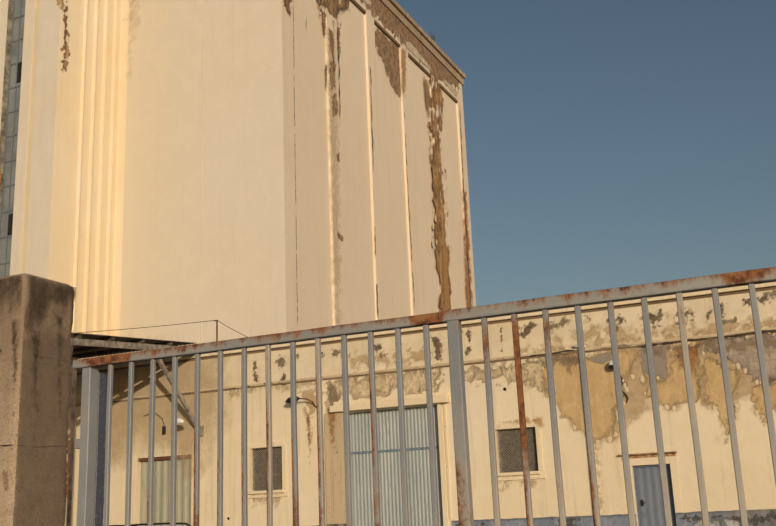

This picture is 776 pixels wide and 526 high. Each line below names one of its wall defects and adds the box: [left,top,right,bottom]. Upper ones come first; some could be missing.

spalling [57,0,70,72]
peeling [317,0,350,117]
peeling [375,29,406,97]
spalling [424,74,452,311]
damp [0,275,76,327]
damp [11,322,73,526]
damp [103,361,216,459]
peeling [326,362,445,413]
peeling [464,333,776,444]
crack [621,376,629,407]